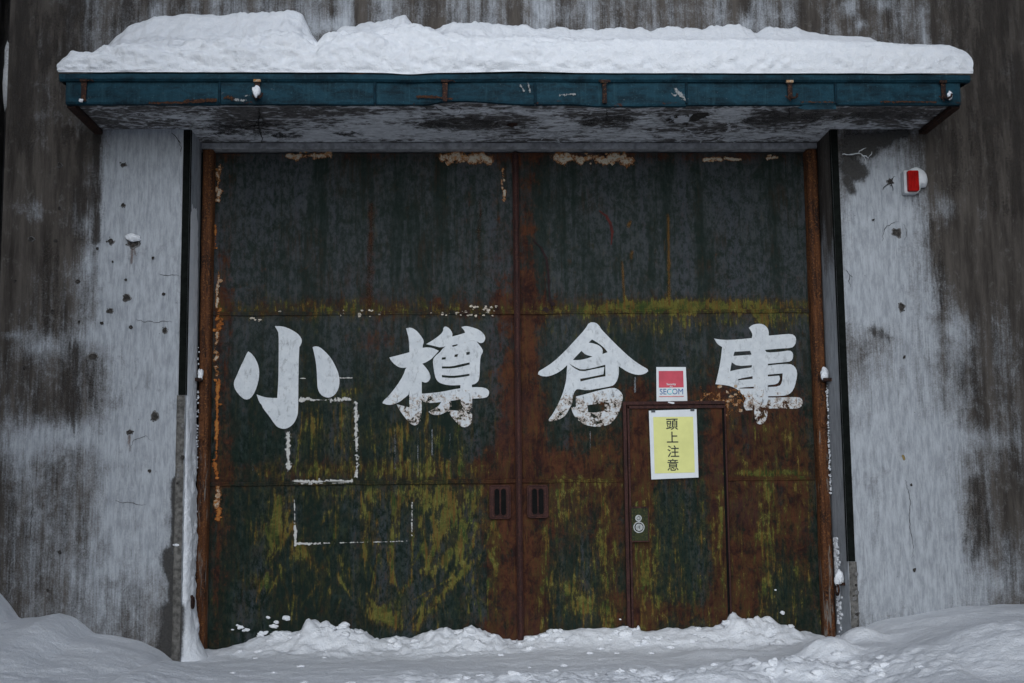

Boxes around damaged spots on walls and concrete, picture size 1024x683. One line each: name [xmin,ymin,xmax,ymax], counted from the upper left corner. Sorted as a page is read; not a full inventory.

damp [62,127,101,243]
peeling [439,152,506,202]
peeling [551,151,635,169]
damp [60,341,96,433]
damp [965,477,989,555]
damp [156,477,185,657]